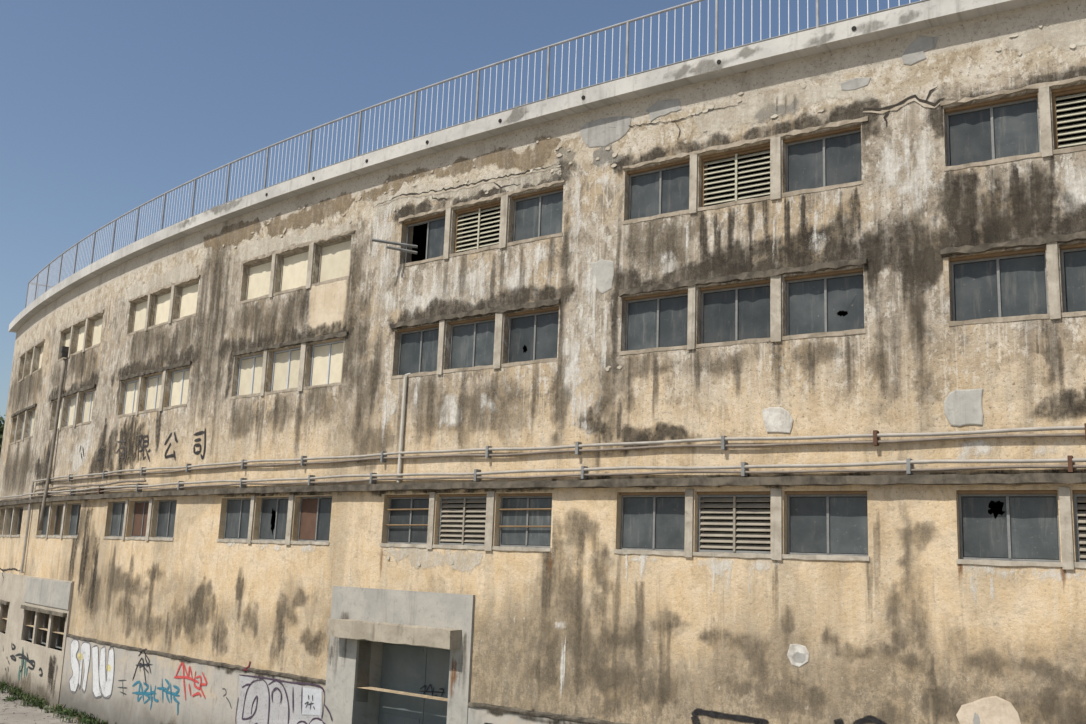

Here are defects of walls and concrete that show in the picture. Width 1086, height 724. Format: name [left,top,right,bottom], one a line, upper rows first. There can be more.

crack [863,87,945,126]
water stain [970,66,1086,98]
peeling [204,136,575,263]
water stain [111,98,1086,468]
water stain [72,411,161,477]
water stain [971,468,1086,485]
water stain [69,490,226,663]
water stain [236,574,257,635]
water stain [276,591,306,646]
water stain [536,512,671,707]
water stain [901,525,930,574]
water stain [1029,664,1086,724]